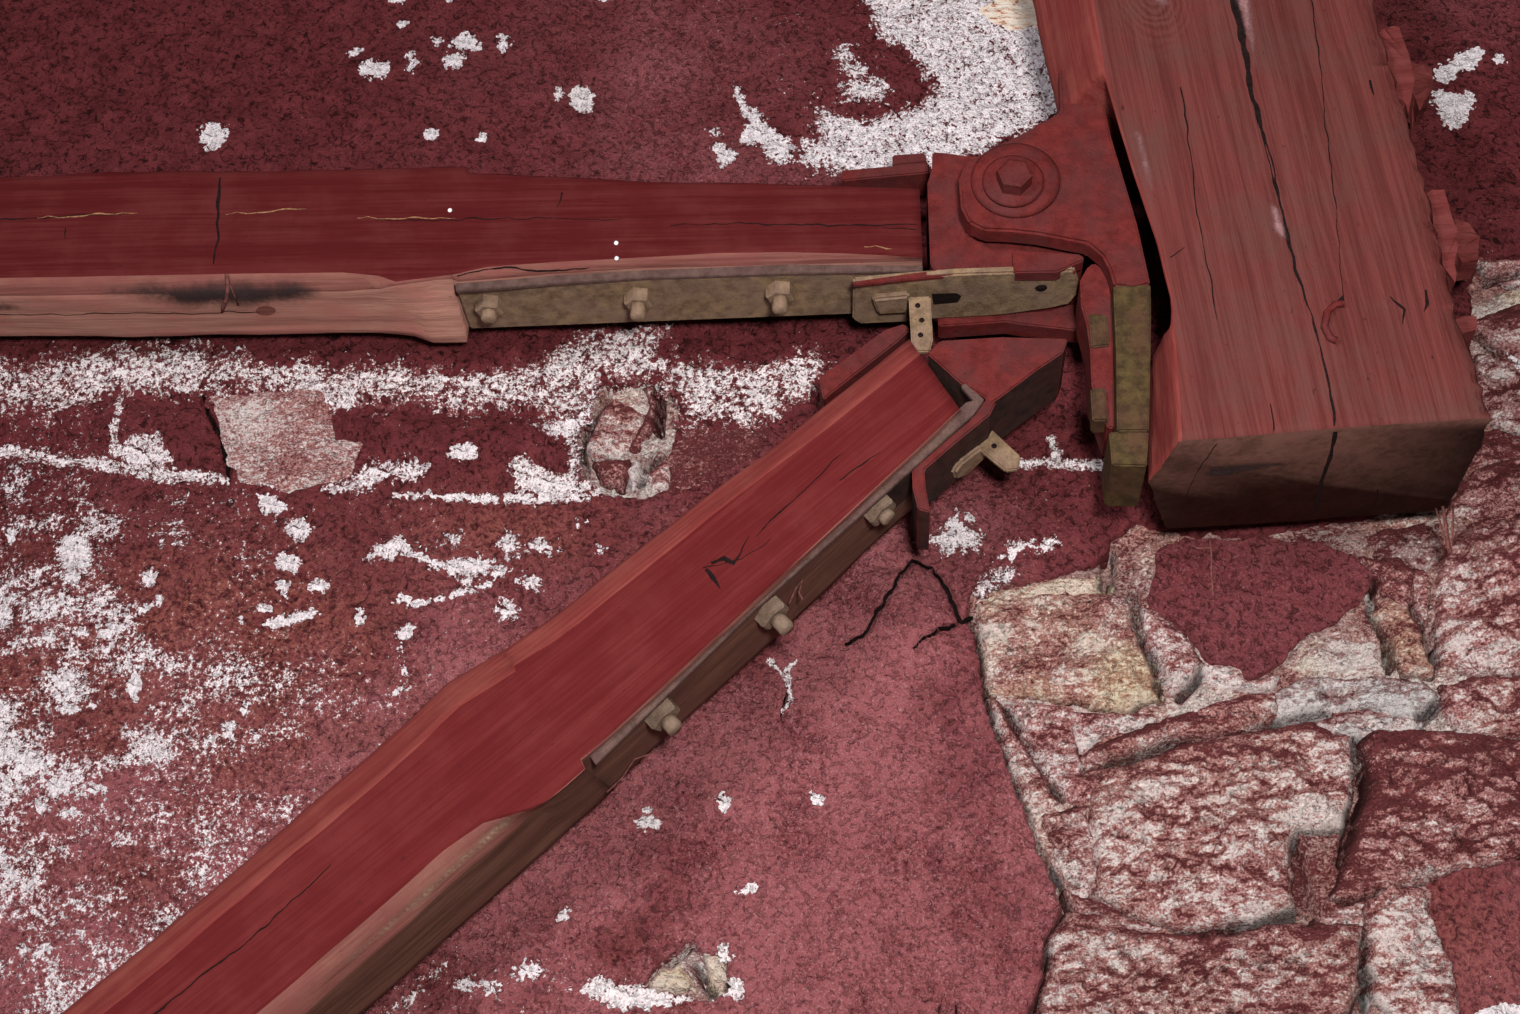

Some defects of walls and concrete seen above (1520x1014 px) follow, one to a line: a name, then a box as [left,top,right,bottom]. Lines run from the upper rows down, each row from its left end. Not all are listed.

peeling [0,321,838,696]
crack [845,559,973,649]
flaking render [929,257,1520,1014]
peeling [714,791,732,814]
peeling [809,790,826,806]
peeling [633,806,663,833]
peeling [733,882,759,895]
peeling [555,905,572,922]
flaking render [568,942,745,1013]